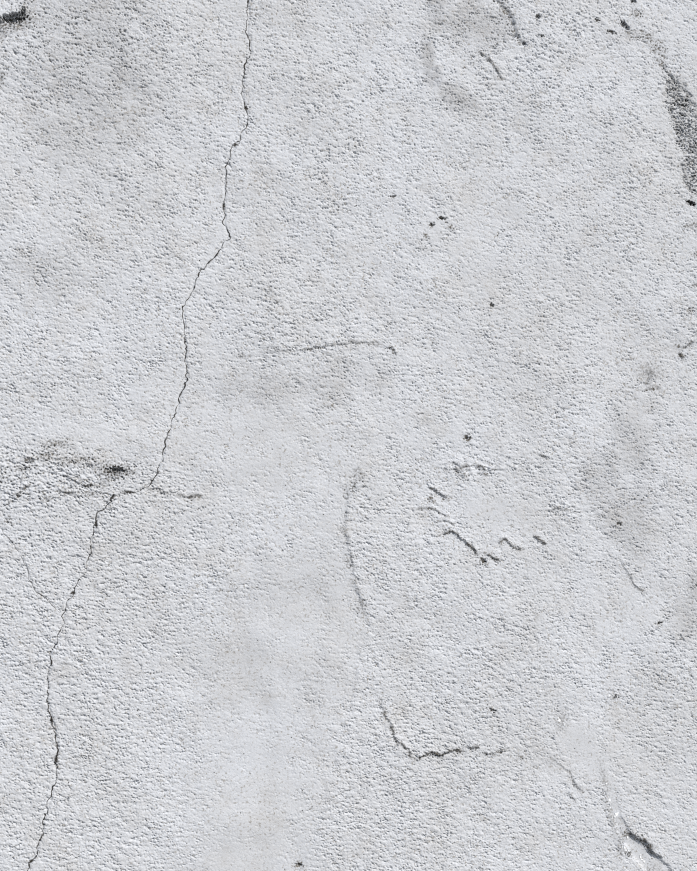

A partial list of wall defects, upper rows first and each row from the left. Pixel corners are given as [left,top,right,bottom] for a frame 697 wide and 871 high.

crack [5,0,251,871]
crack [385,712,522,760]